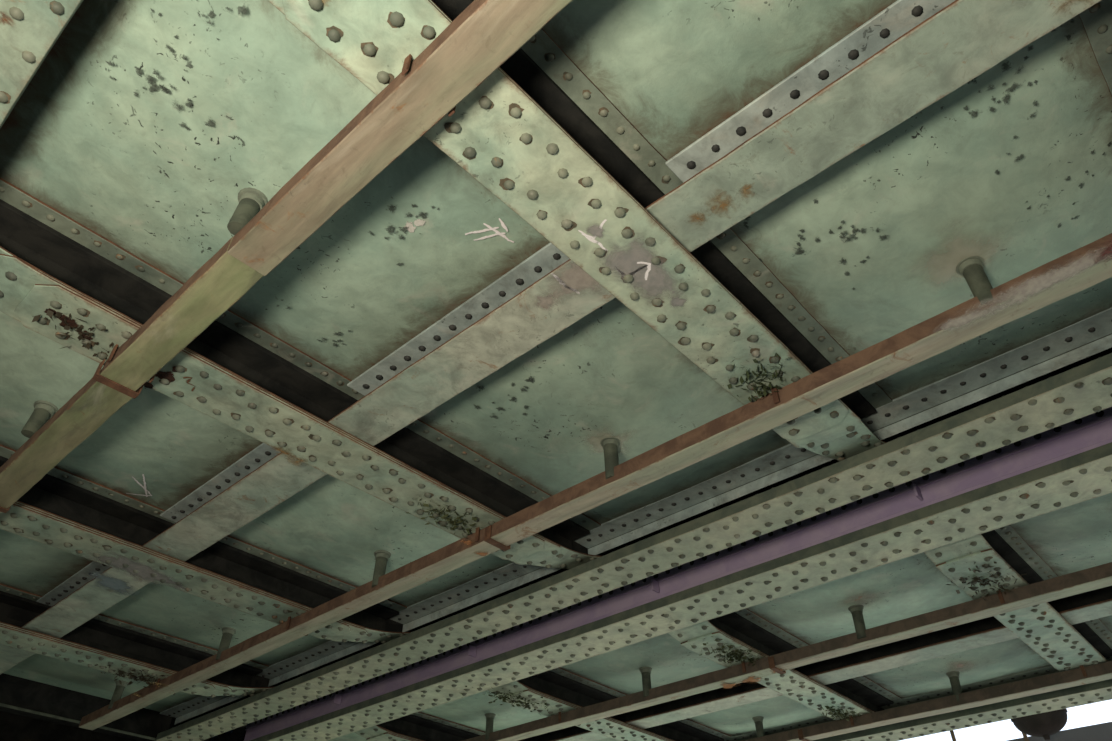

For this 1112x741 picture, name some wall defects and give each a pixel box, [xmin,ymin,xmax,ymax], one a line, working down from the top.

peeling [587,225,603,237]
peeling [537,263,599,309]
peeling [605,239,686,306]
corrosion [44,308,94,340]